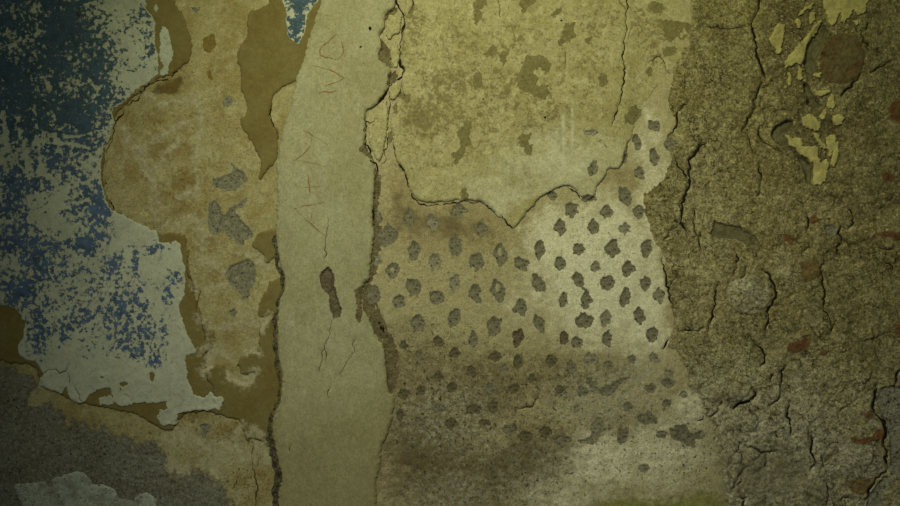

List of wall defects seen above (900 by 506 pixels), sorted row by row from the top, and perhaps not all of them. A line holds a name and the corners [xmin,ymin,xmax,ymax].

spalling [378,39,398,85]
peeling [451,120,472,164]
peeling [514,54,551,100]
crack [667,94,688,138]
crack [708,0,781,196]
crack [840,25,886,98]
peeling [0,0,233,506]
spalling [319,267,342,318]
crack [660,144,705,307]
flaking render [643,0,900,506]
crack [662,253,816,506]
crack [826,370,900,506]